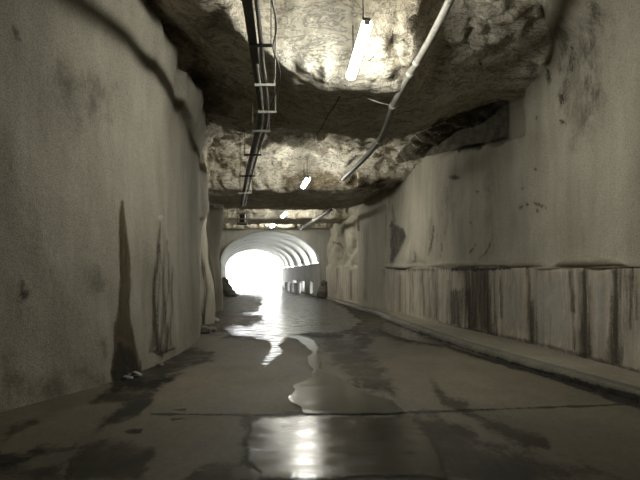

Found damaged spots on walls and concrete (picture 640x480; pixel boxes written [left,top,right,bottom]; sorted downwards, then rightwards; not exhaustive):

water stain [91,201,214,427]
water stain [202,290,262,338]
water stain [303,301,640,409]
water stain [450,266,511,336]
water stain [548,269,639,372]